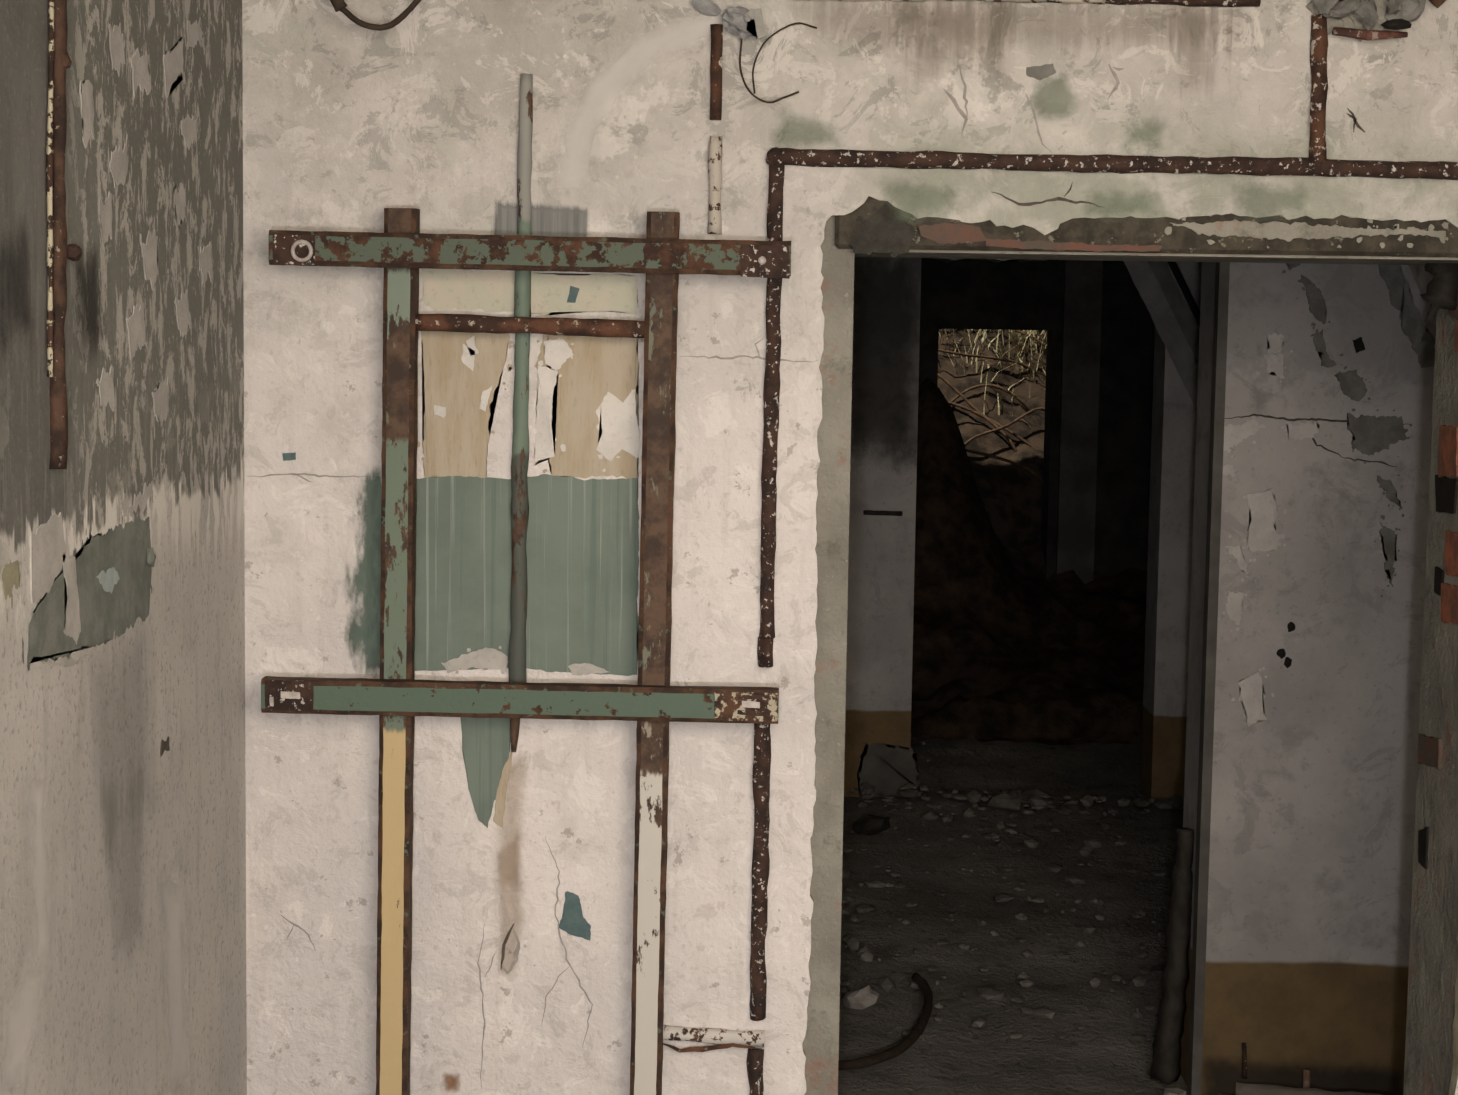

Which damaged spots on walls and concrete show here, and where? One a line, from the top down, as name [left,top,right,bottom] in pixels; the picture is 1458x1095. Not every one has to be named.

peeling [845,203,1452,257]
water stain [78,259,99,340]
peeling [417,268,645,479]
peeling [0,477,156,671]
peeling [442,646,508,674]
peeling [568,663,608,676]
flaking render [1418,734,1443,770]
peeling [559,891,591,940]